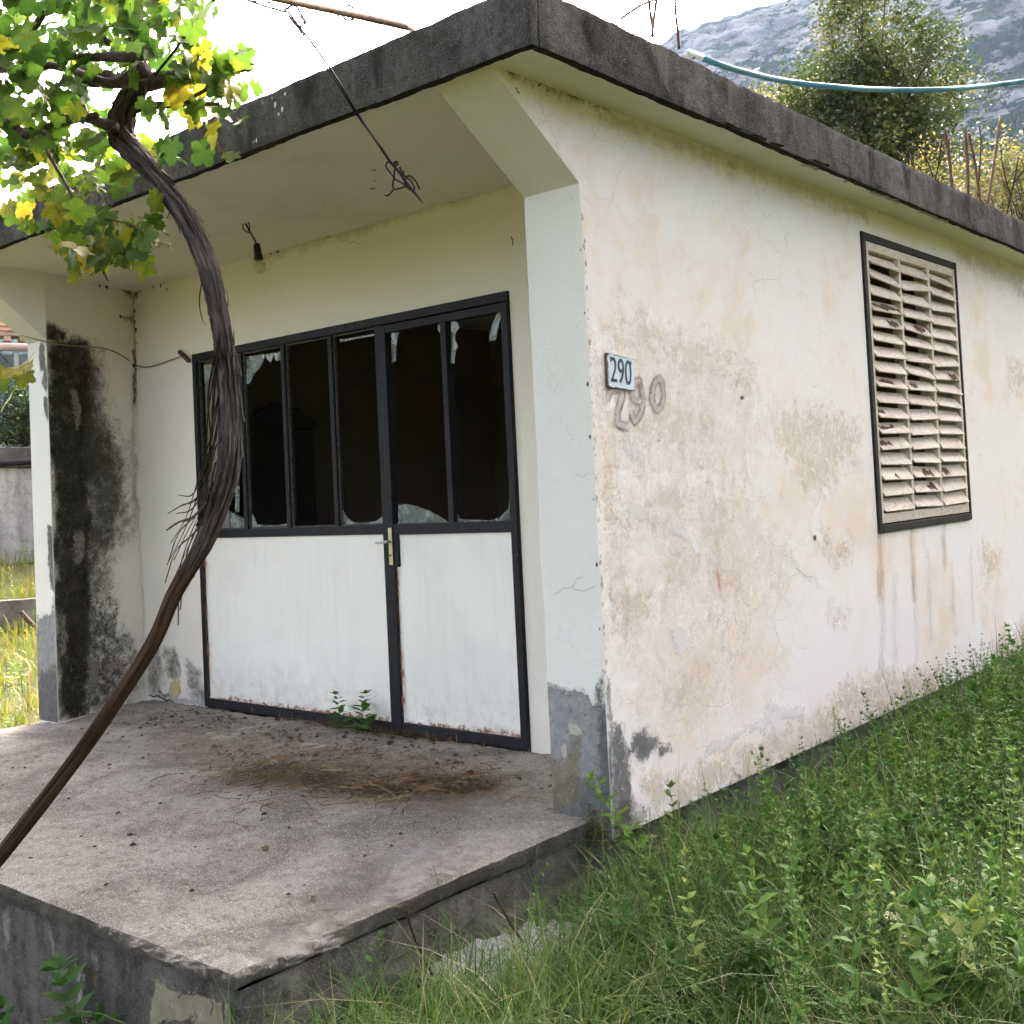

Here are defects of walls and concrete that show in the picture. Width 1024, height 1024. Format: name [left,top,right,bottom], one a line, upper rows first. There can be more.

leakage [119,284,167,403]
leakage [36,322,136,723]
leakage [149,652,205,703]
rust [204,559,389,722]
leakage [547,678,672,839]